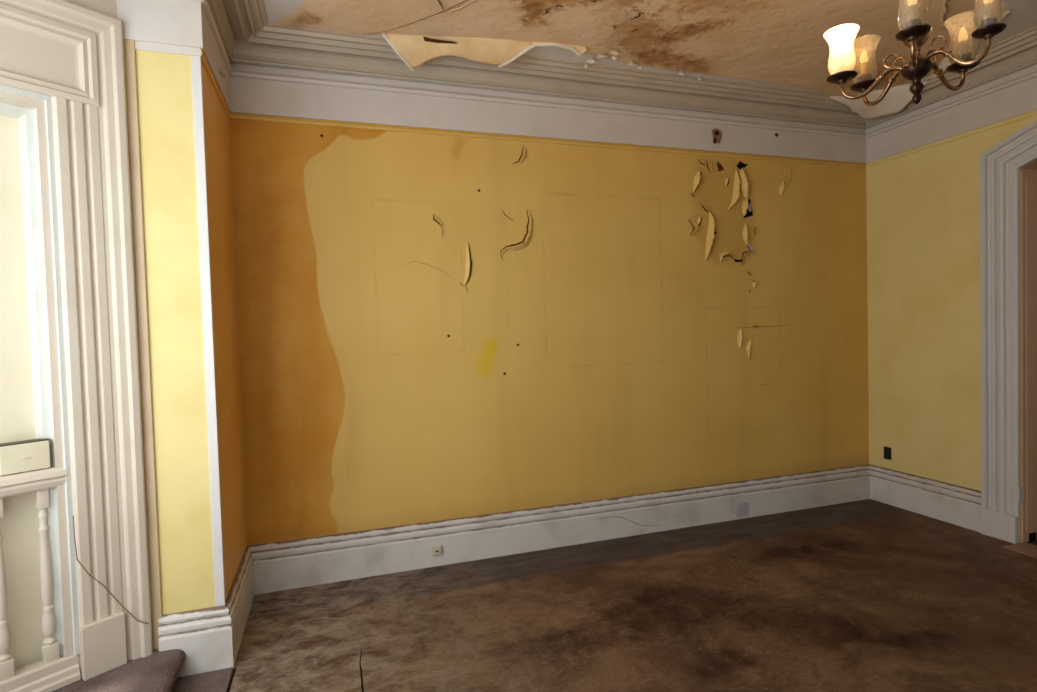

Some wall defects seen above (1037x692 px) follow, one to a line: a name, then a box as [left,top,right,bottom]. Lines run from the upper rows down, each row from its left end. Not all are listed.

peeling [689,158,757,293]